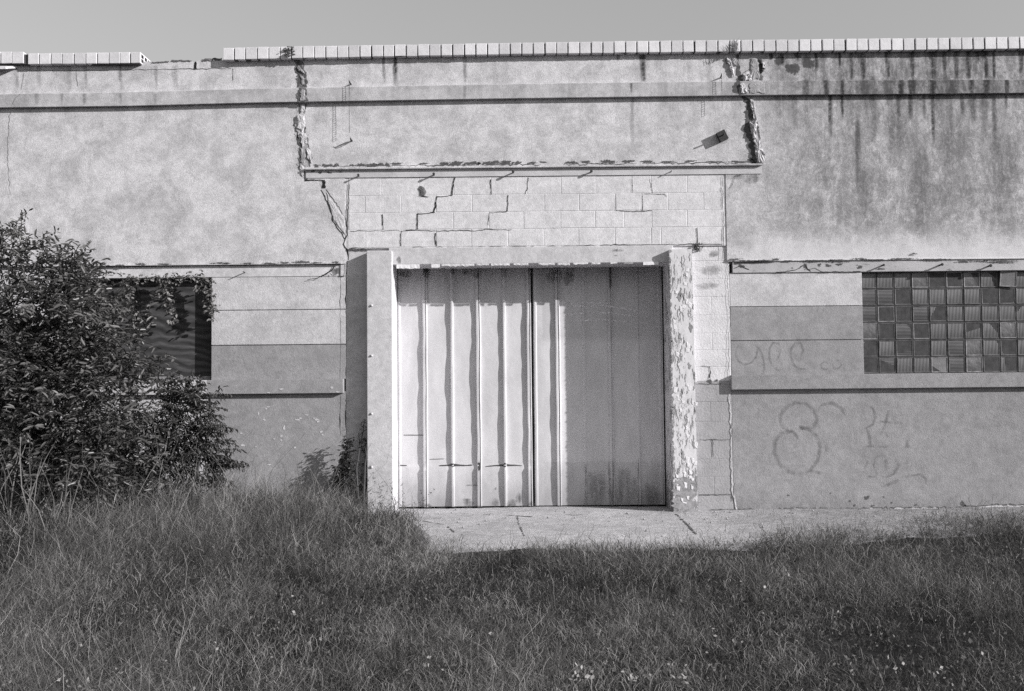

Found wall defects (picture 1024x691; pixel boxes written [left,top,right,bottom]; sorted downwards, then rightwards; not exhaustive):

damp [758,53,818,84]
damp [824,52,870,120]
damp [884,51,1009,134]
crack [293,60,554,314]
crack [585,55,766,508]
crack [342,339,350,433]
peeling [669,250,701,512]